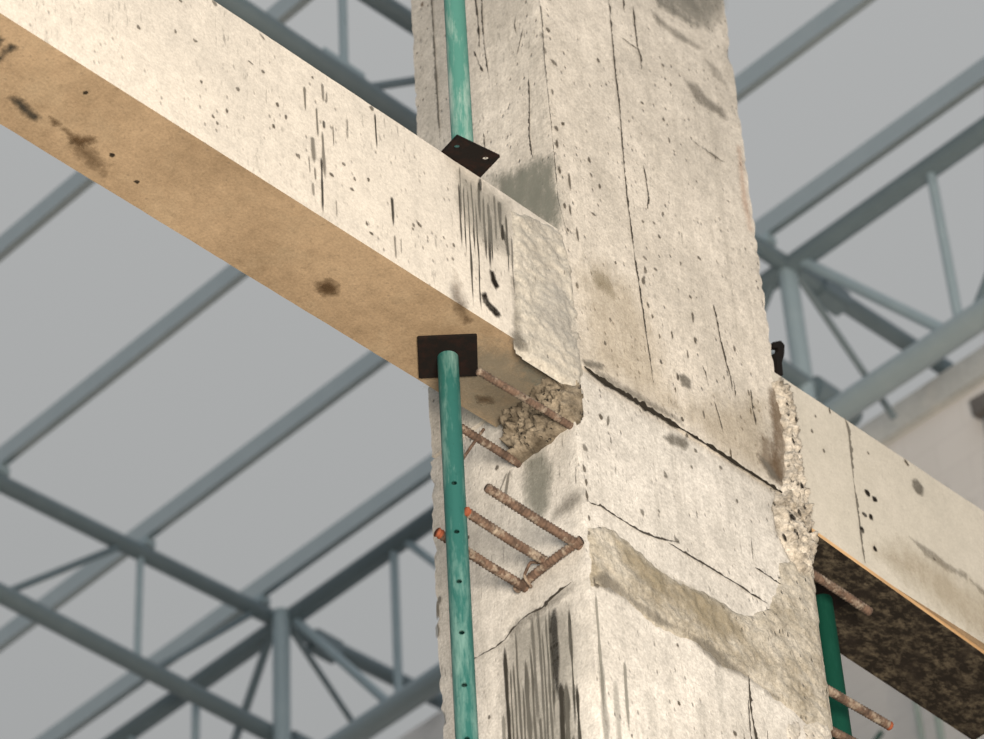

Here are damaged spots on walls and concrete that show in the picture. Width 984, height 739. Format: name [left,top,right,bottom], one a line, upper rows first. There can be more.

leakage [12,99,37,119]
leakage [68,134,93,158]
leakage [458,161,560,302]
crack [584,0,782,493]
spalling [462,368,584,468]
crack [587,499,781,602]
crack [474,582,571,659]
leakage [502,610,582,739]
leakage [595,597,604,706]